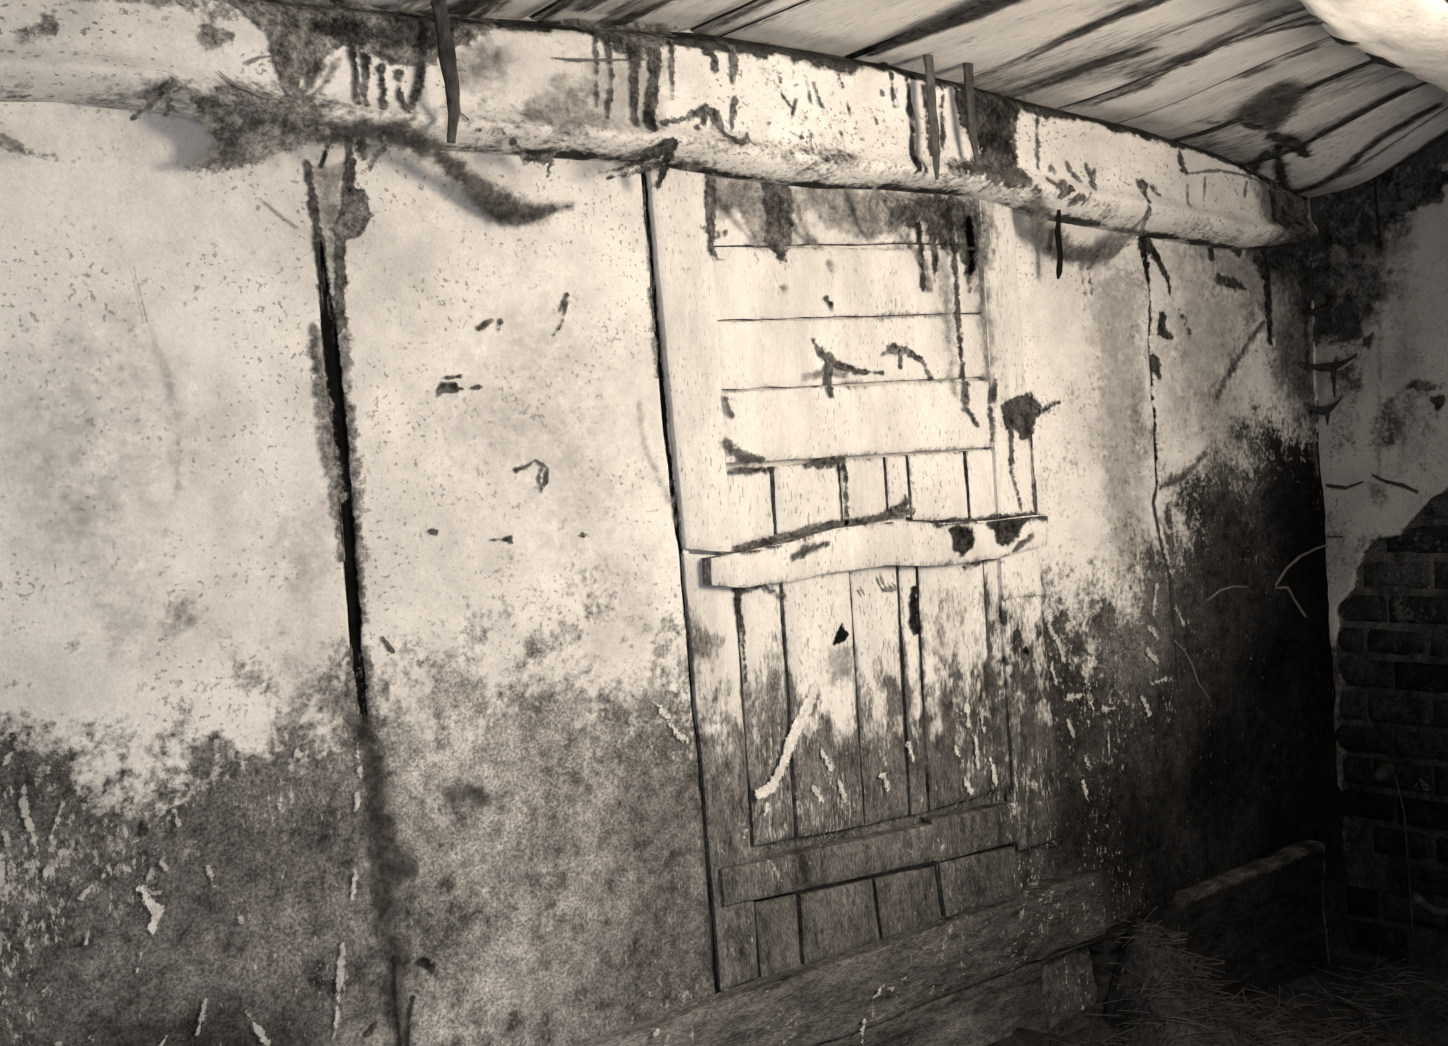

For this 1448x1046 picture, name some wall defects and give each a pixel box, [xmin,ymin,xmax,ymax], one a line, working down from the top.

damp [458,44,504,85]
damp [525,96,595,128]
crack [1213,248,1273,401]
damp [1206,82,1448,474]
crack [1139,237,1206,689]
crack [260,157,415,1046]
damp [387,848,418,878]
damp [448,785,497,807]
flaking render [1335,491,1448,958]